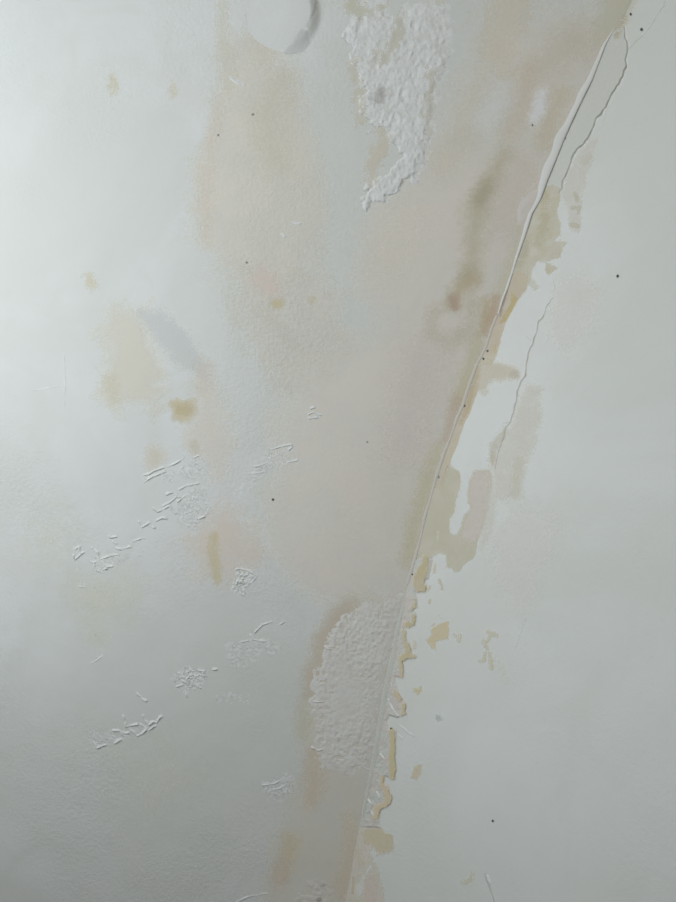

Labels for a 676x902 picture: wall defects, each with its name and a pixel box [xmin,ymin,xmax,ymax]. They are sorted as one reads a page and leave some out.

flaking render [341,0,455,212]
peeling [70,454,211,589]
leakage [99,310,232,477]
leakage [189,0,635,902]
peeling [360,26,627,829]
crack [495,286,555,466]